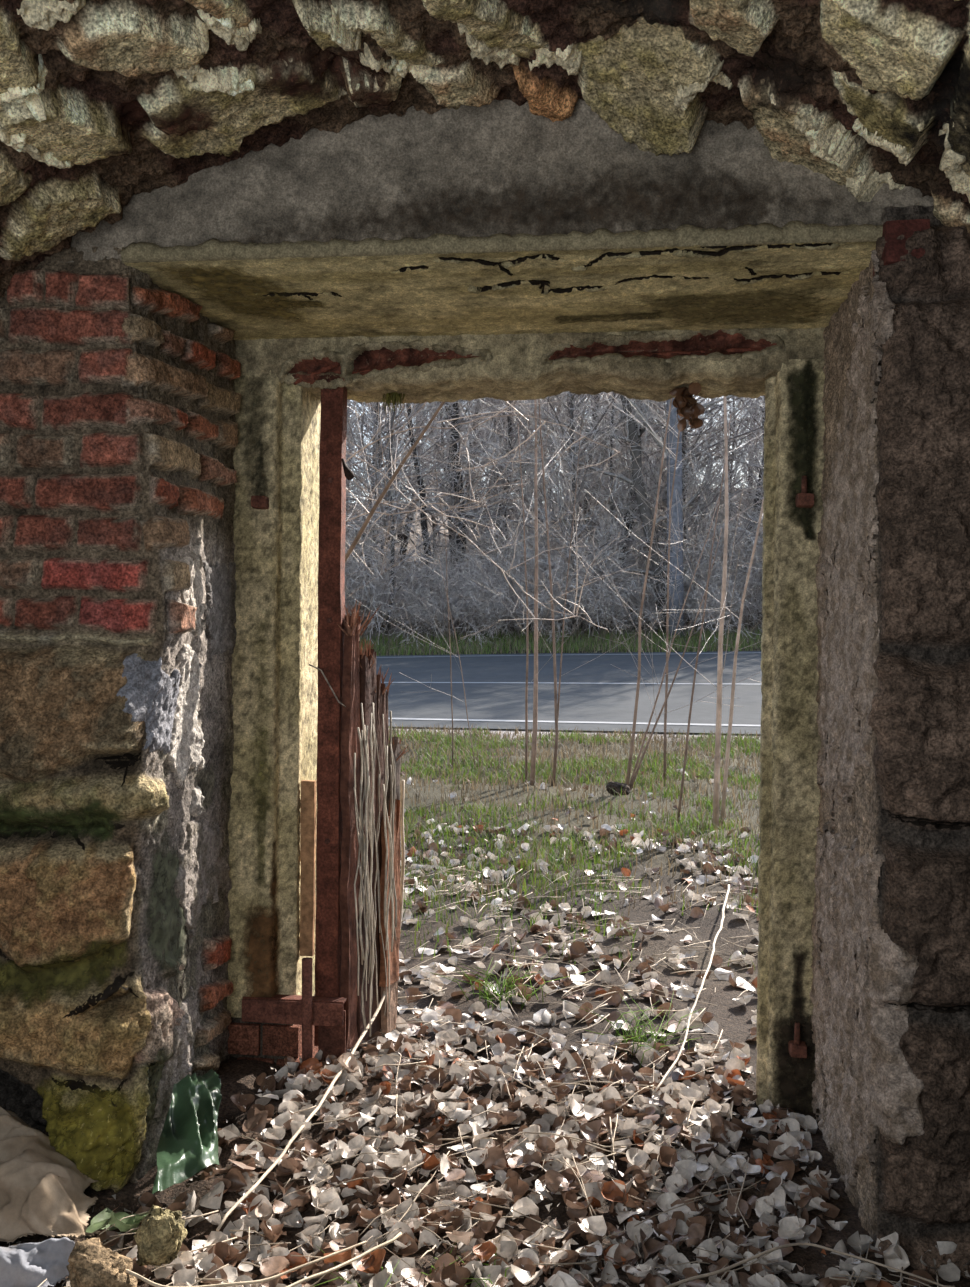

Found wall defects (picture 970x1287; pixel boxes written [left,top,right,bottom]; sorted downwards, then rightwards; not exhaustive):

crack [395,243,841,295]
crack [262,292,342,300]